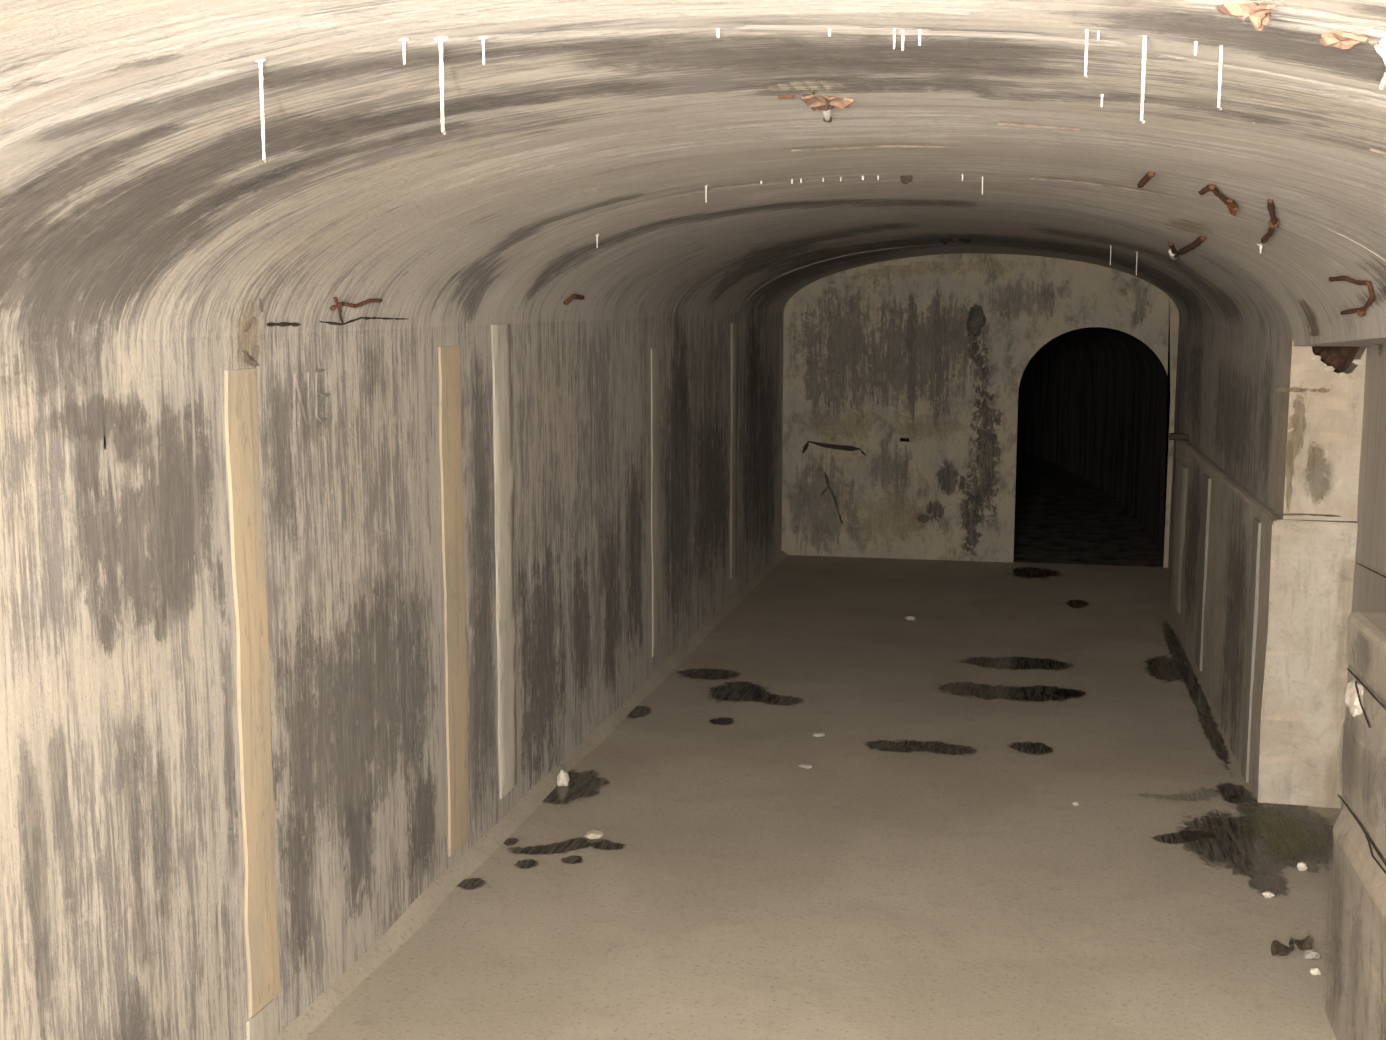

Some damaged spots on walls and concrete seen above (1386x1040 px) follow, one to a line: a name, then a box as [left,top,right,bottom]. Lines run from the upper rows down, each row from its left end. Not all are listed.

crack [242,299,404,367]
water stain [0,0,1386,653]
water stain [518,455,645,784]
water stain [1221,504,1248,751]
crack [1346,668,1386,728]
crack [1338,794,1386,874]